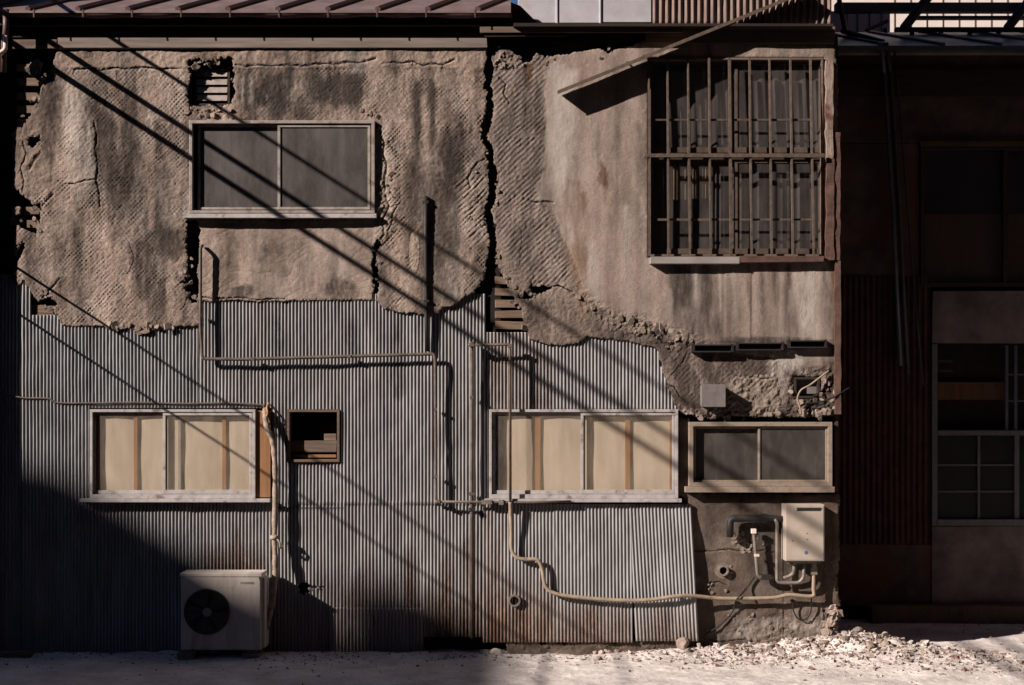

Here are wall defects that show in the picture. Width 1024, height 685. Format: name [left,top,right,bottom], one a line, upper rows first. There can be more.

peeling [190,58,221,71]
flaking render [493,50,522,71]
leakage [313,68,362,108]
flaking render [184,106,234,119]
crack [17,126,100,204]
crack [467,50,509,323]
flaking render [607,314,693,350]
flaking render [682,378,782,422]
flaking render [788,366,842,421]